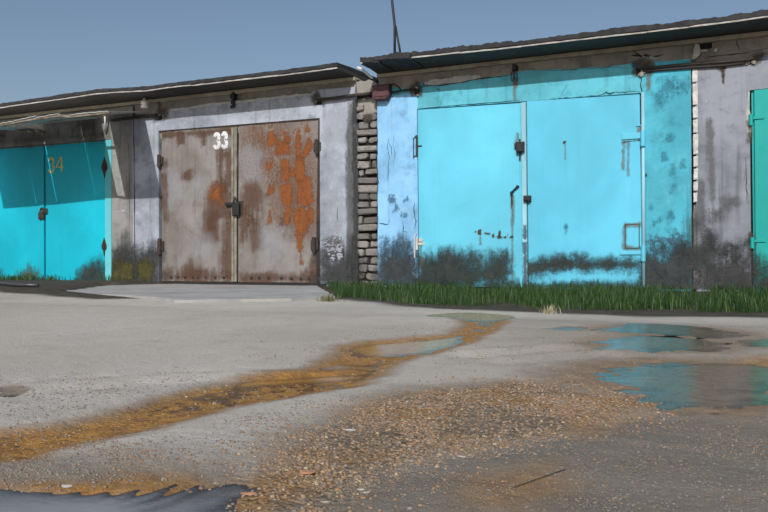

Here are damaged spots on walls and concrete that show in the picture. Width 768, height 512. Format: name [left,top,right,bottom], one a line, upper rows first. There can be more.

water stain [75,245,165,282]
rust [162,125,317,283]
water stain [313,101,363,285]
water stain [372,118,768,290]